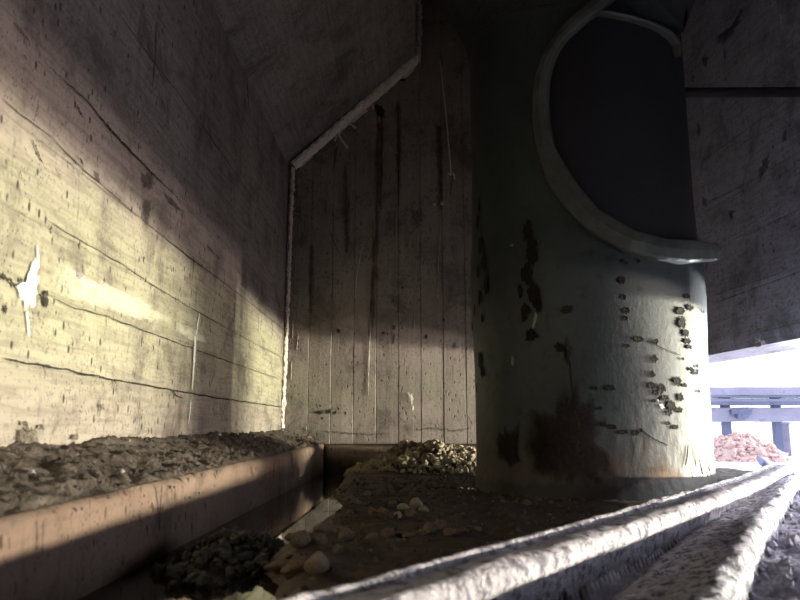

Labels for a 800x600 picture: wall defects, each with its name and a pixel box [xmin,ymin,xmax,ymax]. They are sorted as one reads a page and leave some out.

peeling [517,220,542,341]
peeling [676,293,704,350]
peeling [624,335,687,430]